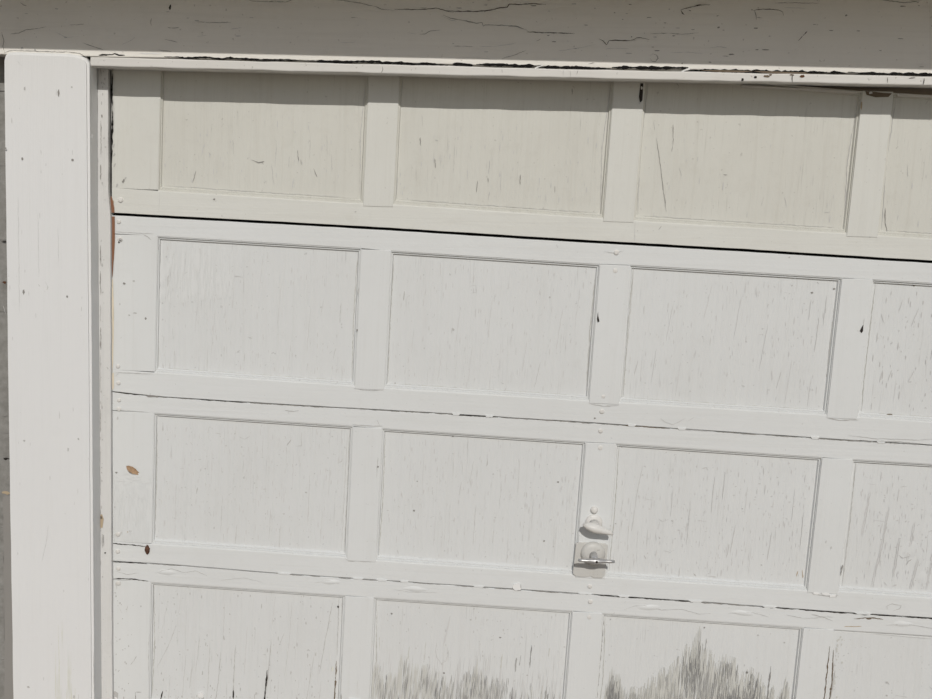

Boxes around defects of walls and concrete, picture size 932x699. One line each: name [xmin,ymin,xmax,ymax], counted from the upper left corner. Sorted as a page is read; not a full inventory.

crack [161,0,932,84]